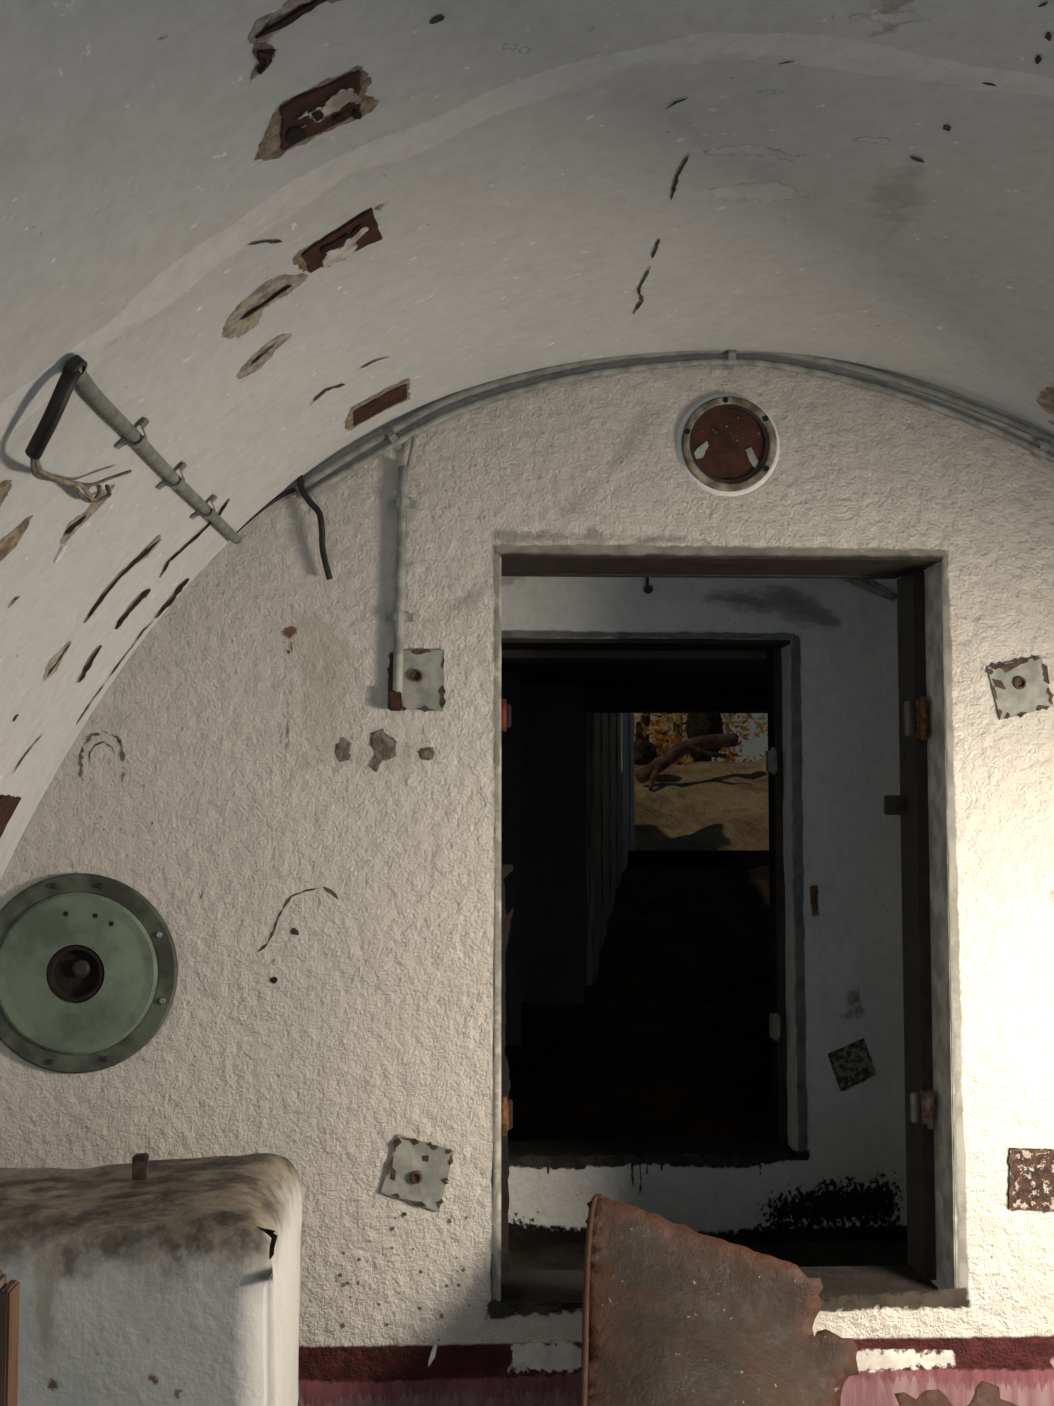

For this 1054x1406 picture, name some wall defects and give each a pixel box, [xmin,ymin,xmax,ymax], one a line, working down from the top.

spalling [248,0,342,82]
spalling [255,66,380,161]
crack [671,155,689,200]
spalling [222,225,363,339]
crack [633,239,660,314]
spalling [345,378,411,431]
spalling [0,480,12,507]
spalling [0,515,33,562]
crack [77,623,152,724]
corrosion [1009,1148,1051,1213]
peeling [299,1340,582,1406]
peeling [840,1349,1054,1406]